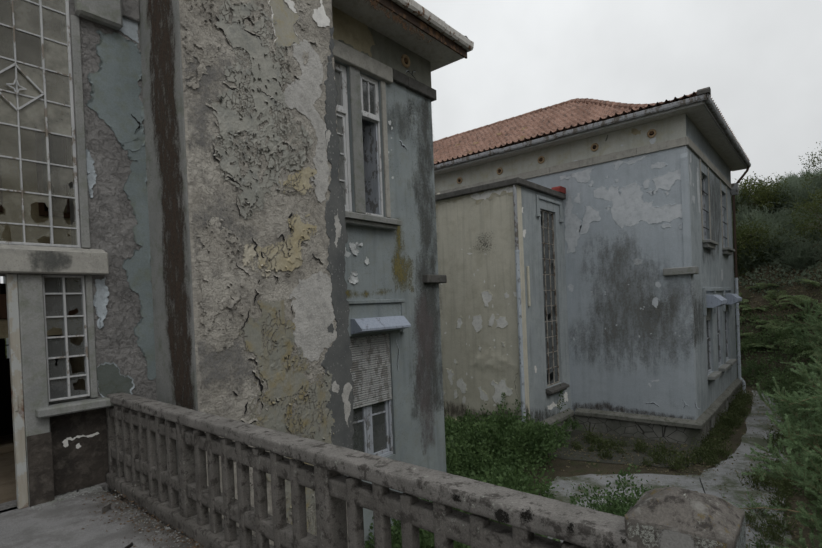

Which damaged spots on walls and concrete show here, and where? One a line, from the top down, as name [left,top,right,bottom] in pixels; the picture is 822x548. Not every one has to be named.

peeling [86,17,145,151]
peeling [86,149,97,198]
peeling [180,0,375,449]
peeling [560,154,683,255]
damp [389,98,488,446]
peeling [93,277,109,329]
peeling [444,280,508,334]
damp [583,243,683,358]
peeling [443,359,514,406]
peeling [62,432,99,449]
peeling [305,487,317,535]